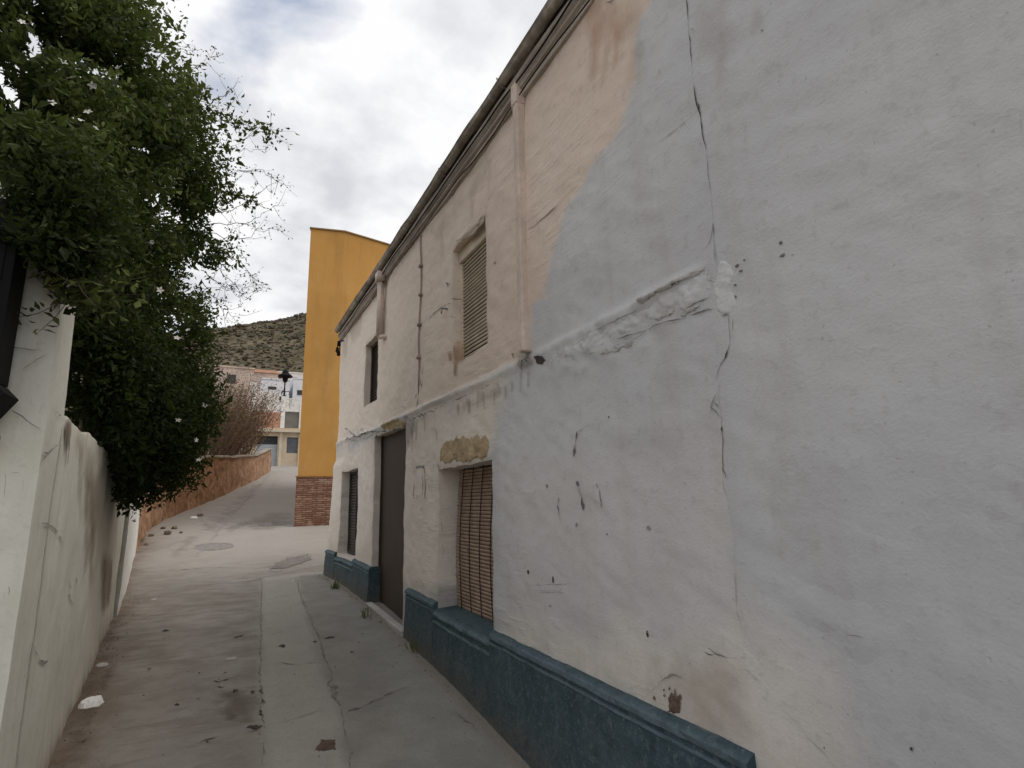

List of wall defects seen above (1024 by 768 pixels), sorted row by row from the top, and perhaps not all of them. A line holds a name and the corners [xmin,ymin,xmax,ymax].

crack [561,0,733,511]
flaking render [533,267,711,364]
flaking render [440,434,489,463]
peeling [653,673,682,714]